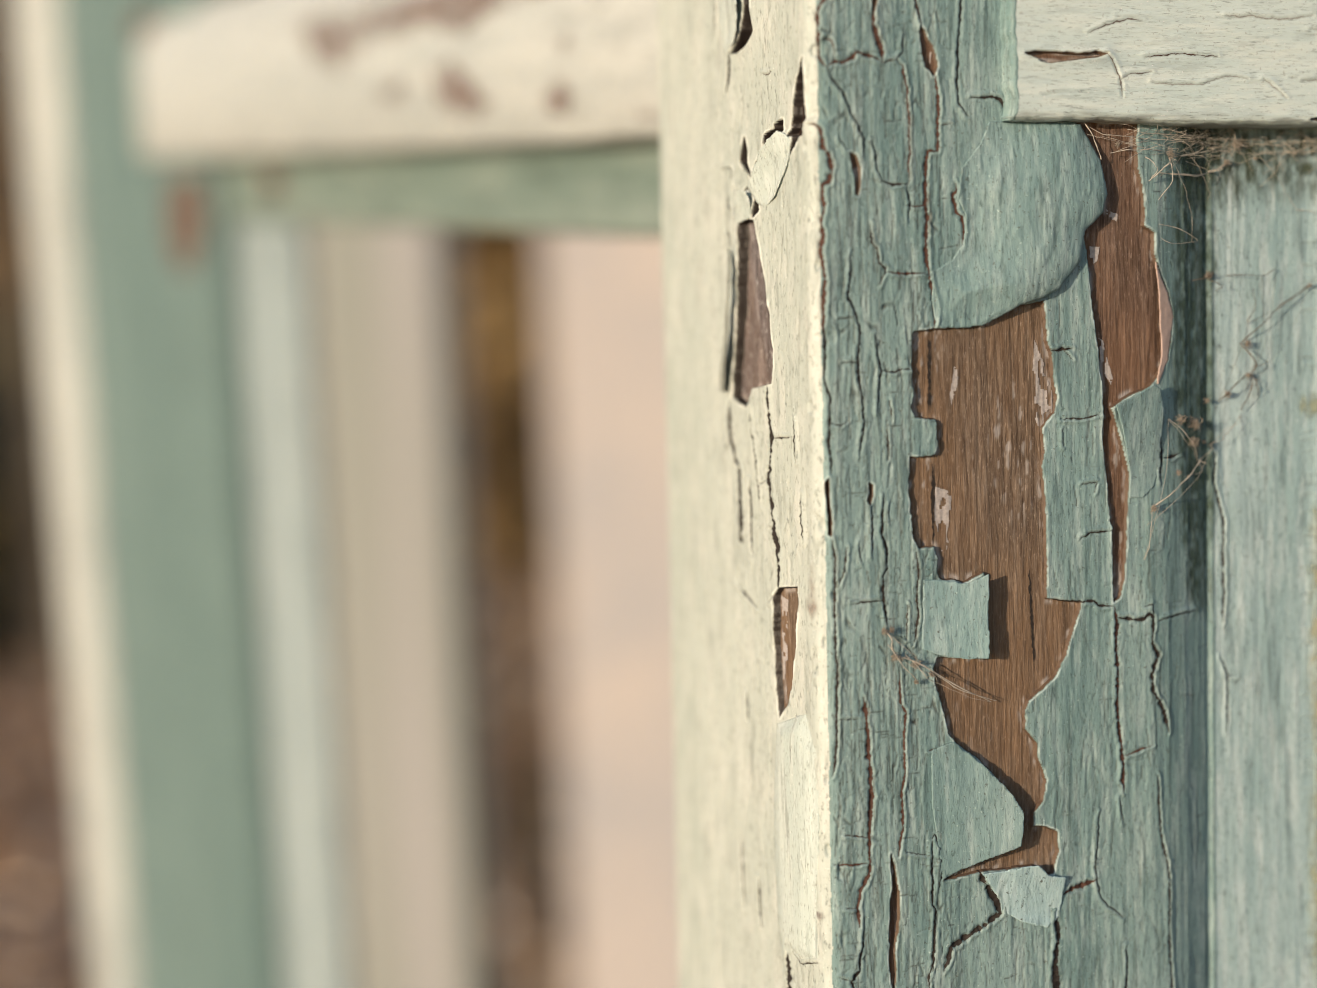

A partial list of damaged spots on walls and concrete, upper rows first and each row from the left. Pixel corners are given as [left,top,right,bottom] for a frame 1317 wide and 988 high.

peeling [718,0,752,52]
crack [1091,18,1317,97]
crack [1227,15,1317,30]
peeling [733,100,806,402]
crack [810,0,1003,474]
peeling [1076,122,1174,599]
crack [1160,442,1181,474]
peeling [781,588,799,708]
crack [725,388,1002,988]
peeling [908,302,1078,927]
crack [1028,457,1225,988]